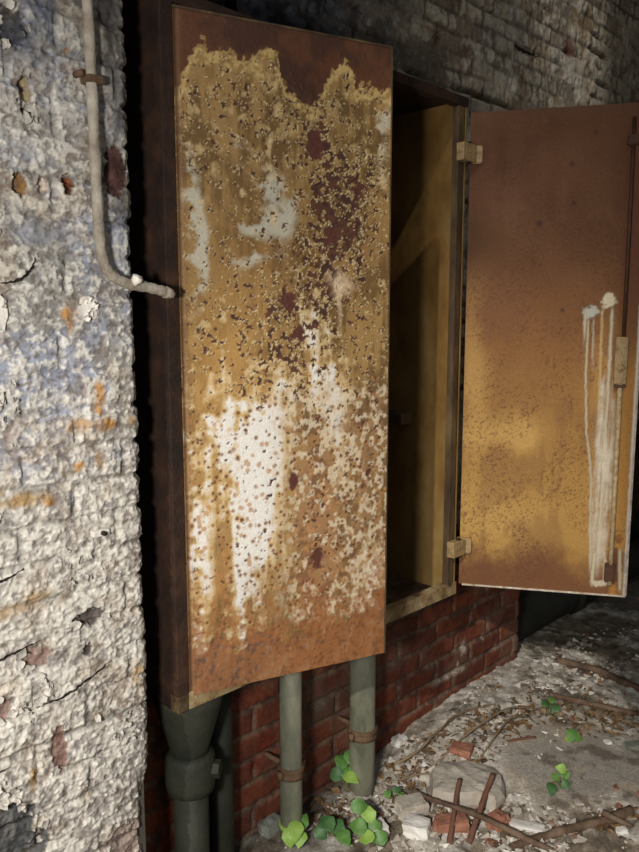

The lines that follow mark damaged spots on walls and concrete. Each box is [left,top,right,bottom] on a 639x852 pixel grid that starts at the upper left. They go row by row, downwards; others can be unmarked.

peeling [631,423,639,522]
spalling [0,779,50,852]